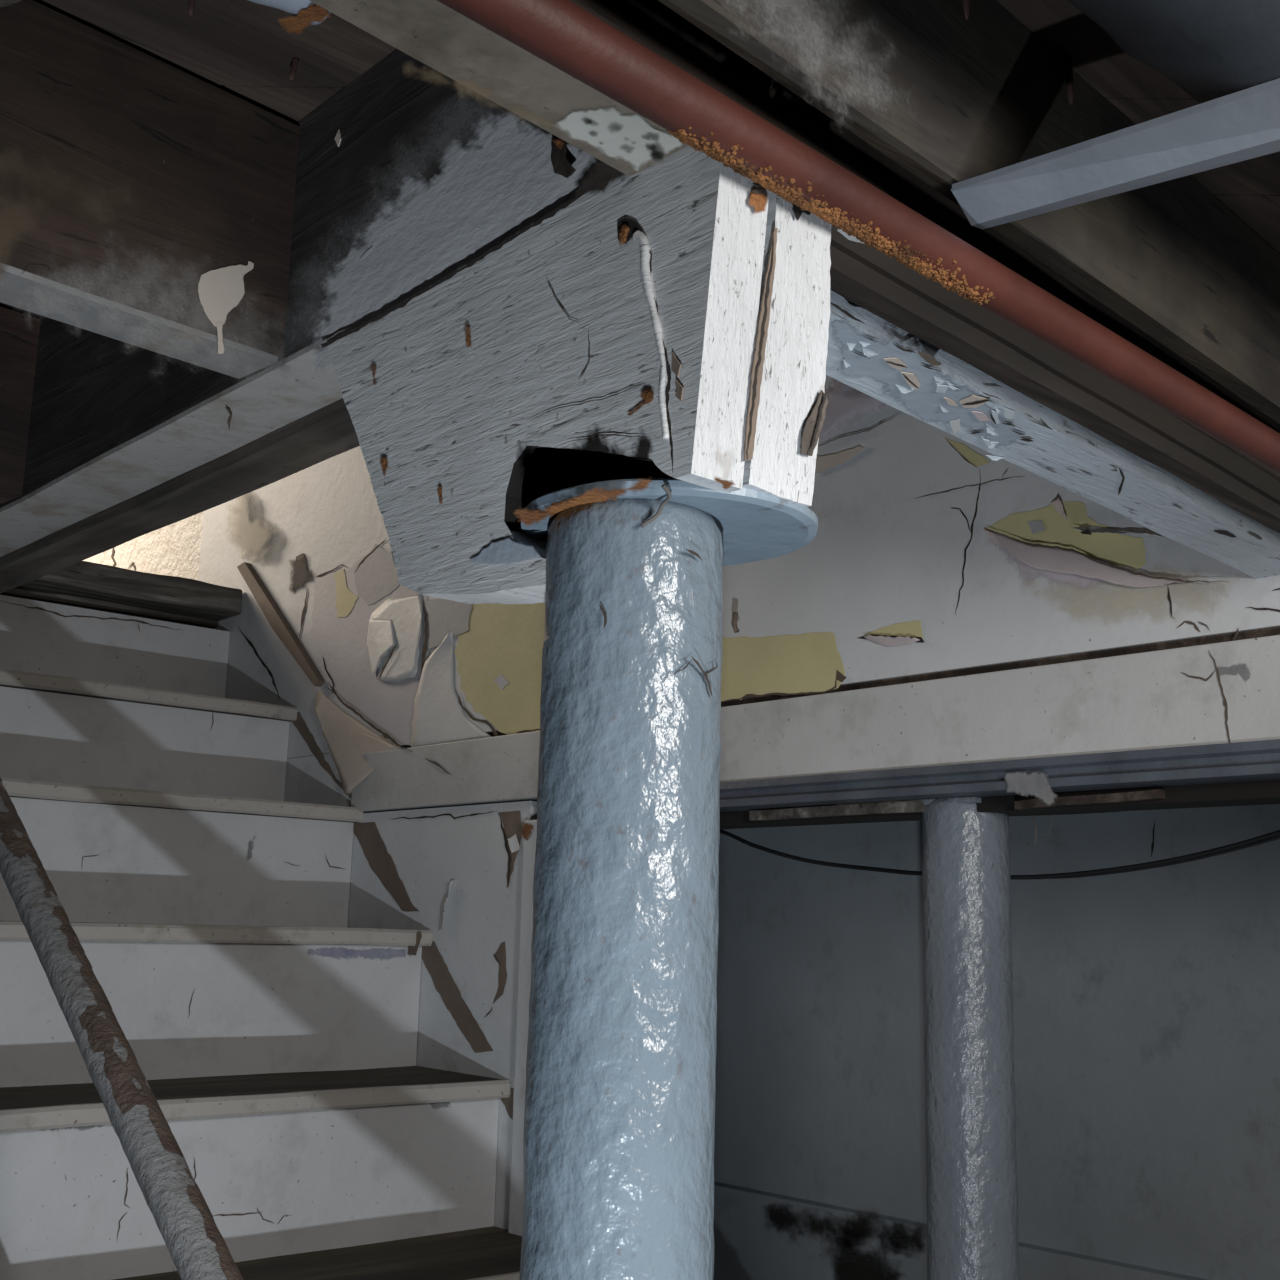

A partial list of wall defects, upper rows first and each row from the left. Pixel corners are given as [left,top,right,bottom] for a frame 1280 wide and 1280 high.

spalling [551,140,576,178]
corrosion [667,127,995,306]
crack [744,227,778,461]
peeling [832,319,1033,468]
crack [914,469,1024,615]
peeling [984,498,1225,588]
crack [1117,468,1125,496]
peeling [290,544,545,795]
peeling [721,632,846,702]
crack [1168,588,1280,743]
peeling [498,810,521,887]
mould [767,1205,923,1280]